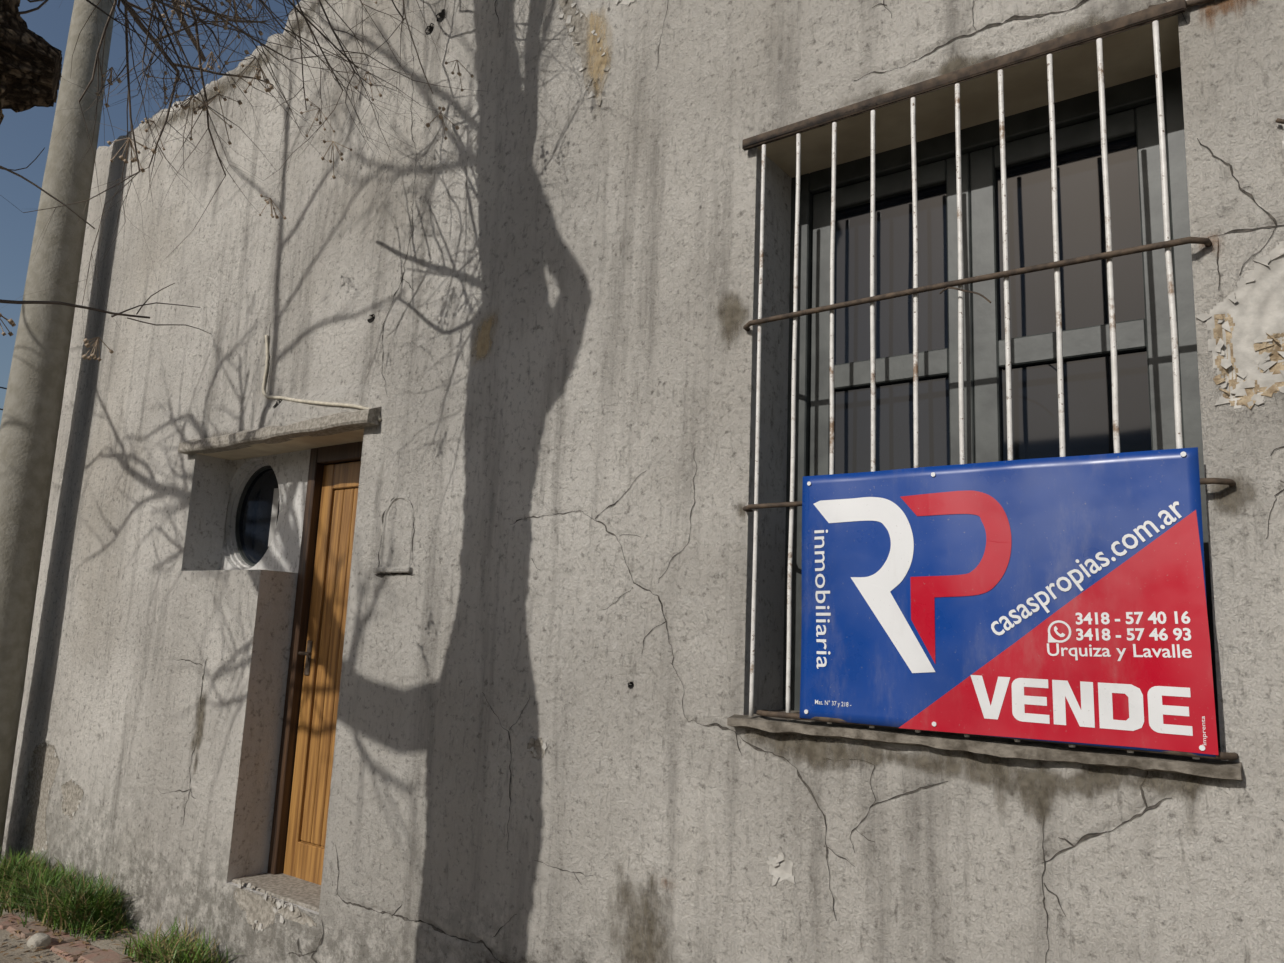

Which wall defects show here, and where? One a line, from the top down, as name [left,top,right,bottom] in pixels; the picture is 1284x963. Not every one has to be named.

spalling [558,0,611,106]
crack [854,0,1088,81]
crack [1197,138,1284,291]
flaking render [1196,241,1284,409]
crack [1266,446,1284,539]
crack [510,449,948,921]
spalling [20,742,84,855]
crack [483,693,593,885]
crack [288,845,517,963]
spalling [766,853,796,885]
crack [1038,771,1167,963]